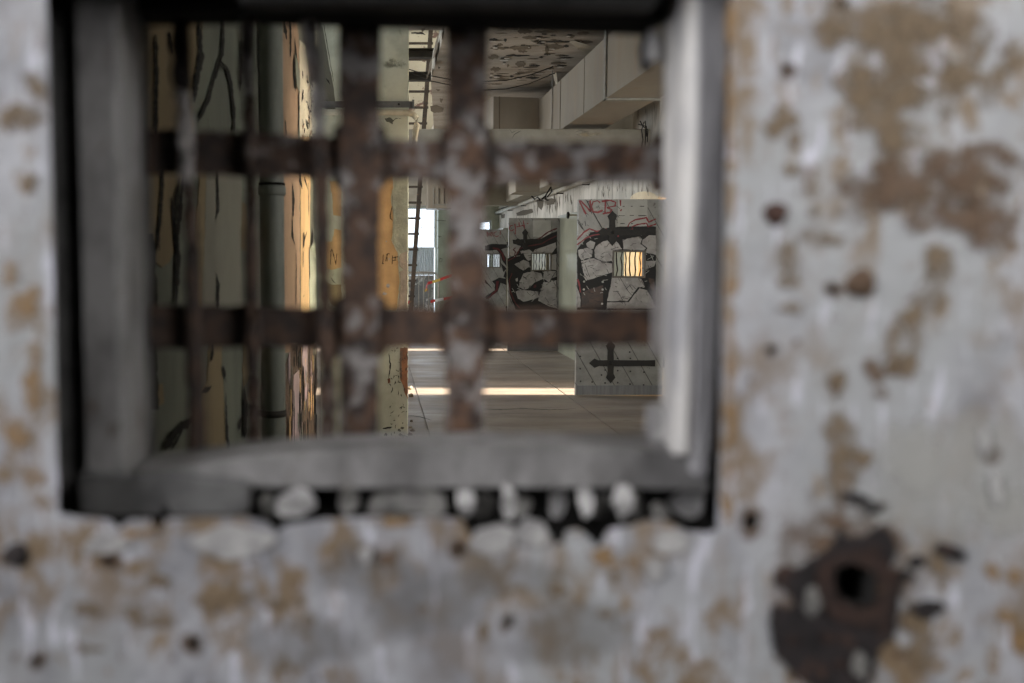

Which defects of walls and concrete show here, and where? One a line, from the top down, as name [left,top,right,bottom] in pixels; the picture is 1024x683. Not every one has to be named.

crack [193,25,242,132]
peeling [488,33,594,85]
crack [156,174,183,305]
corrosion [828,371,845,399]
spalling [359,546,396,566]
corrosion [779,413,967,673]